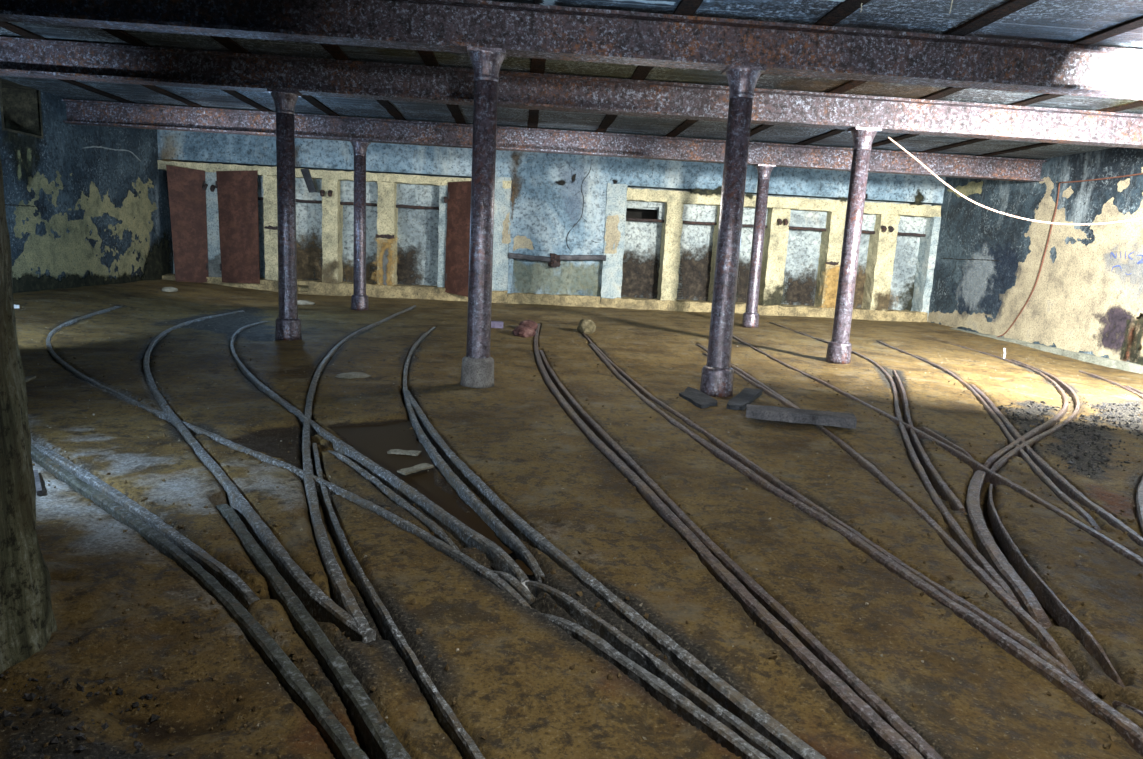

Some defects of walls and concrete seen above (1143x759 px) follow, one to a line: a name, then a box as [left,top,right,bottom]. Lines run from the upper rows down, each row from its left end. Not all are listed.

peeling [12,171,158,280]
damp [296,233,378,284]
damp [397,246,423,285]
damp [513,261,601,295]
damp [621,250,660,299]
damp [677,244,713,301]
damp [735,259,750,303]
damp [761,269,817,306]
peeling [927,177,1143,363]
damp [1093,307,1143,365]